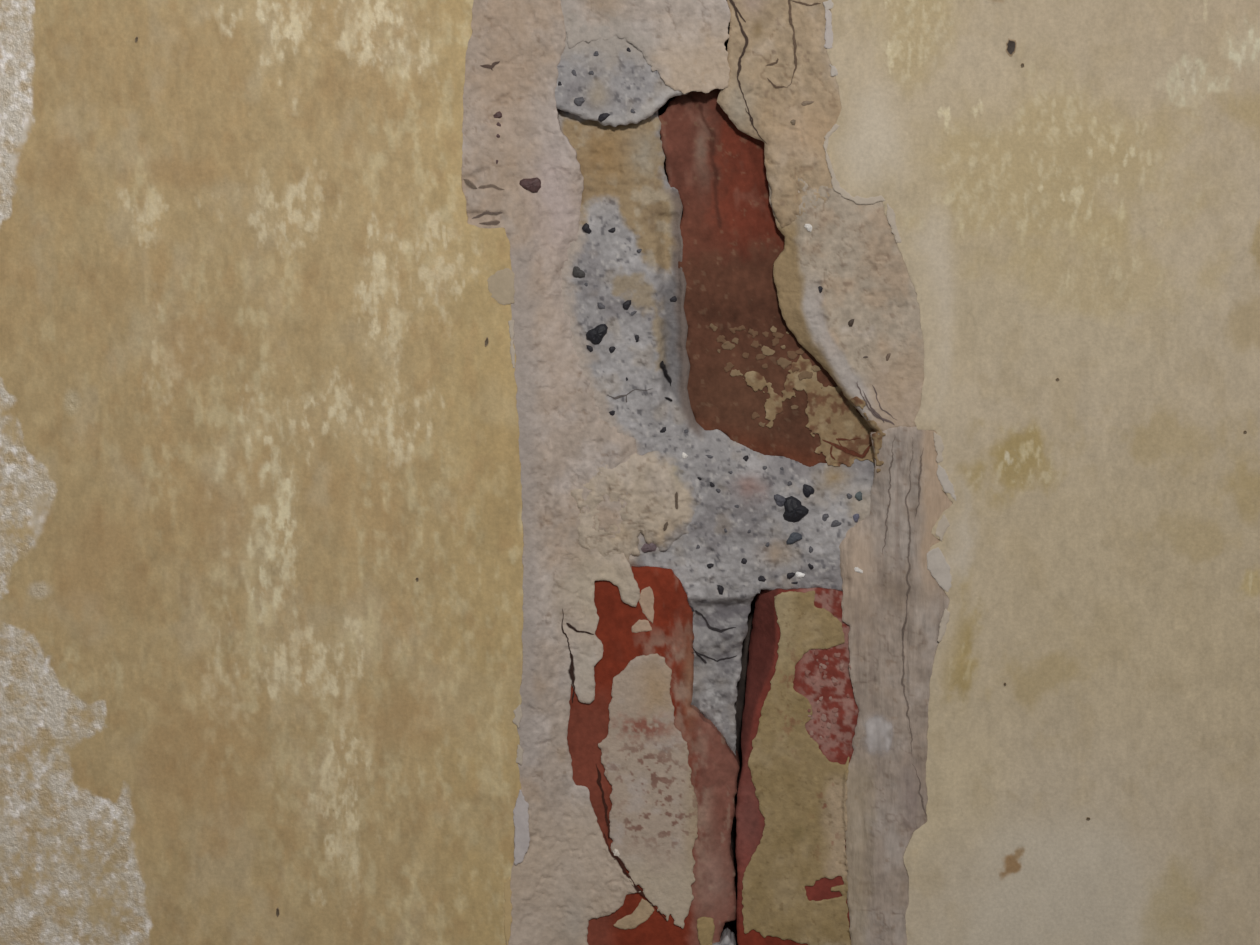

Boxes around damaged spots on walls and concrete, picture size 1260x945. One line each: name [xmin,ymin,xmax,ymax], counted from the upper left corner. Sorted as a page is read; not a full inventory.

crack [730,0,821,144]
flaking render [462,0,702,945]
flaking render [708,0,956,945]
crack [562,609,594,703]
crack [596,765,667,921]
rust [994,845,1028,882]